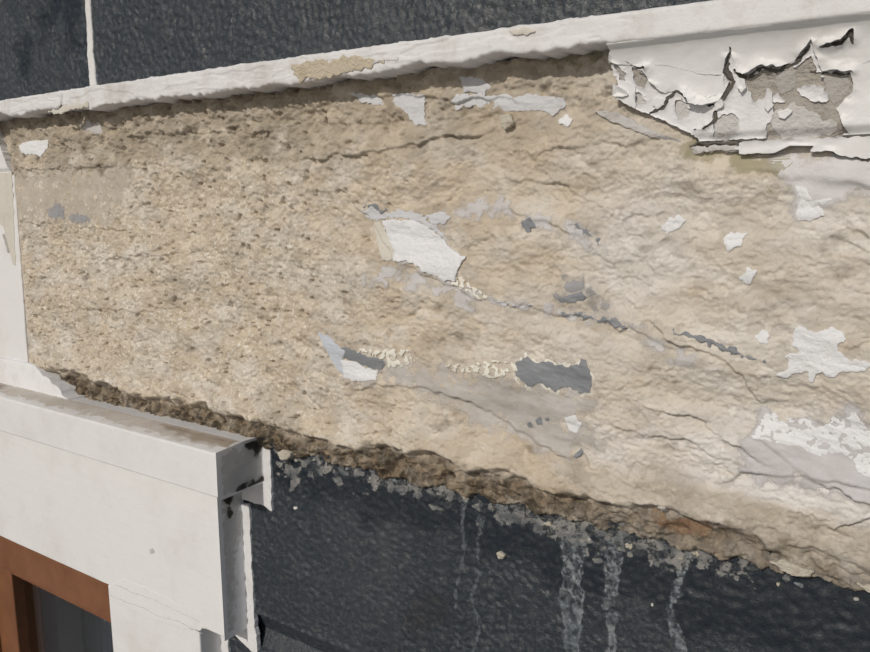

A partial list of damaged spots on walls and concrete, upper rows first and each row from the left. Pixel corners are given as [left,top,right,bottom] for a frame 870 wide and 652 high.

crack [631,30,870,148]
peeling [735,56,853,140]
peeling [361,206,467,285]
peeling [318,332,386,382]
peeling [515,352,595,400]
peeling [777,326,870,383]
peeling [738,403,870,504]
water stain [454,500,484,608]
water stain [559,530,586,652]
water stain [601,536,625,652]
water stain [668,550,692,652]
spalling [769,557,815,577]